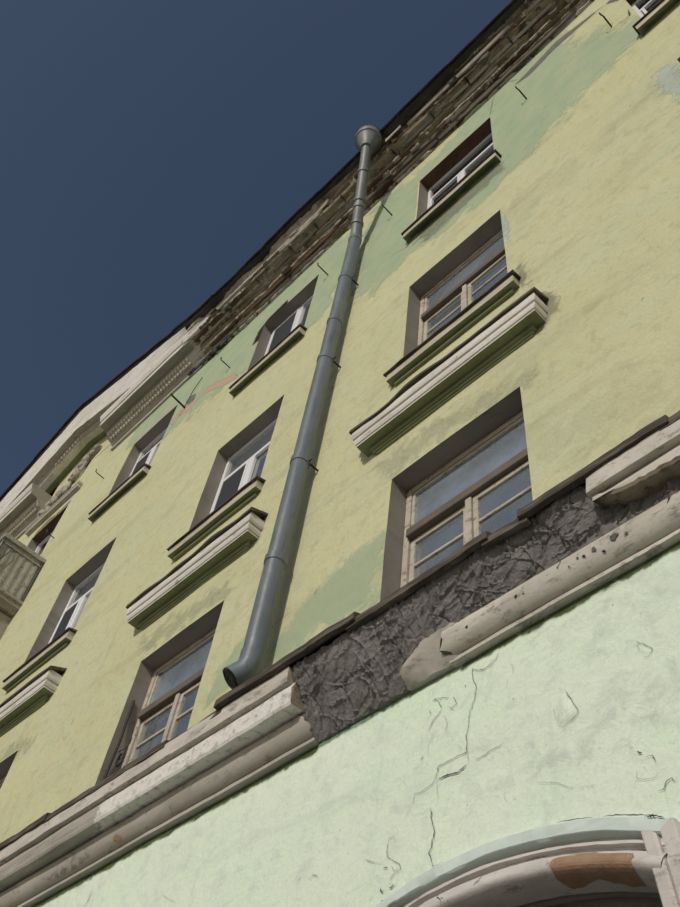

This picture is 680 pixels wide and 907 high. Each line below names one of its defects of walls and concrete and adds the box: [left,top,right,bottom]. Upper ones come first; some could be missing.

crack [410,653,499,866]
crack [366,836,401,901]
spalling [550,852,647,889]